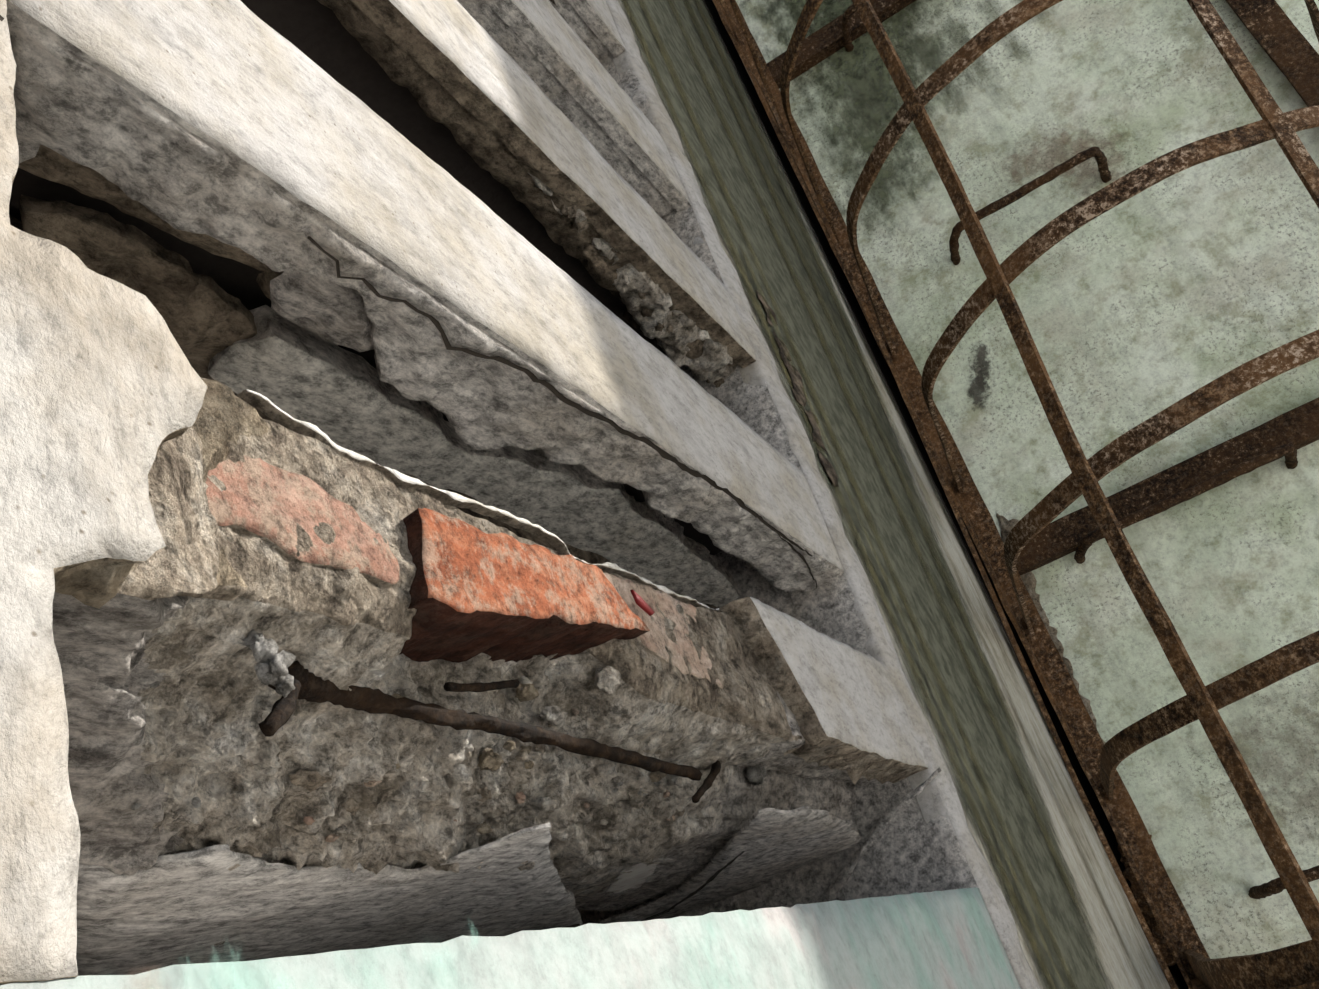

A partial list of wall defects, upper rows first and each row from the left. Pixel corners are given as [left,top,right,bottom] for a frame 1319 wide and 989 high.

spalling [6,8,879,976]
crack [307,236,817,588]